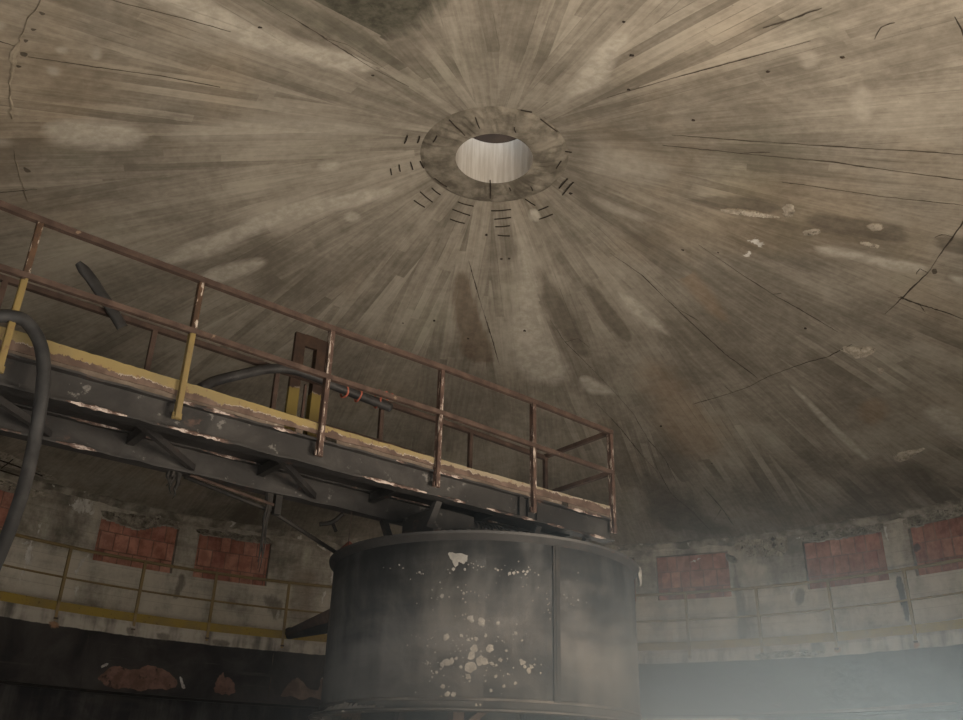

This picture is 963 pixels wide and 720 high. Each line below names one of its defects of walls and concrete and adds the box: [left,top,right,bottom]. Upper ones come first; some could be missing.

damp [135,0,457,82]
crack [663,135,963,180]
spalling [720,203,796,219]
spalling [859,223,884,248]
crack [783,182,963,319]
crack [610,245,852,404]
peeling [56,441,97,452]